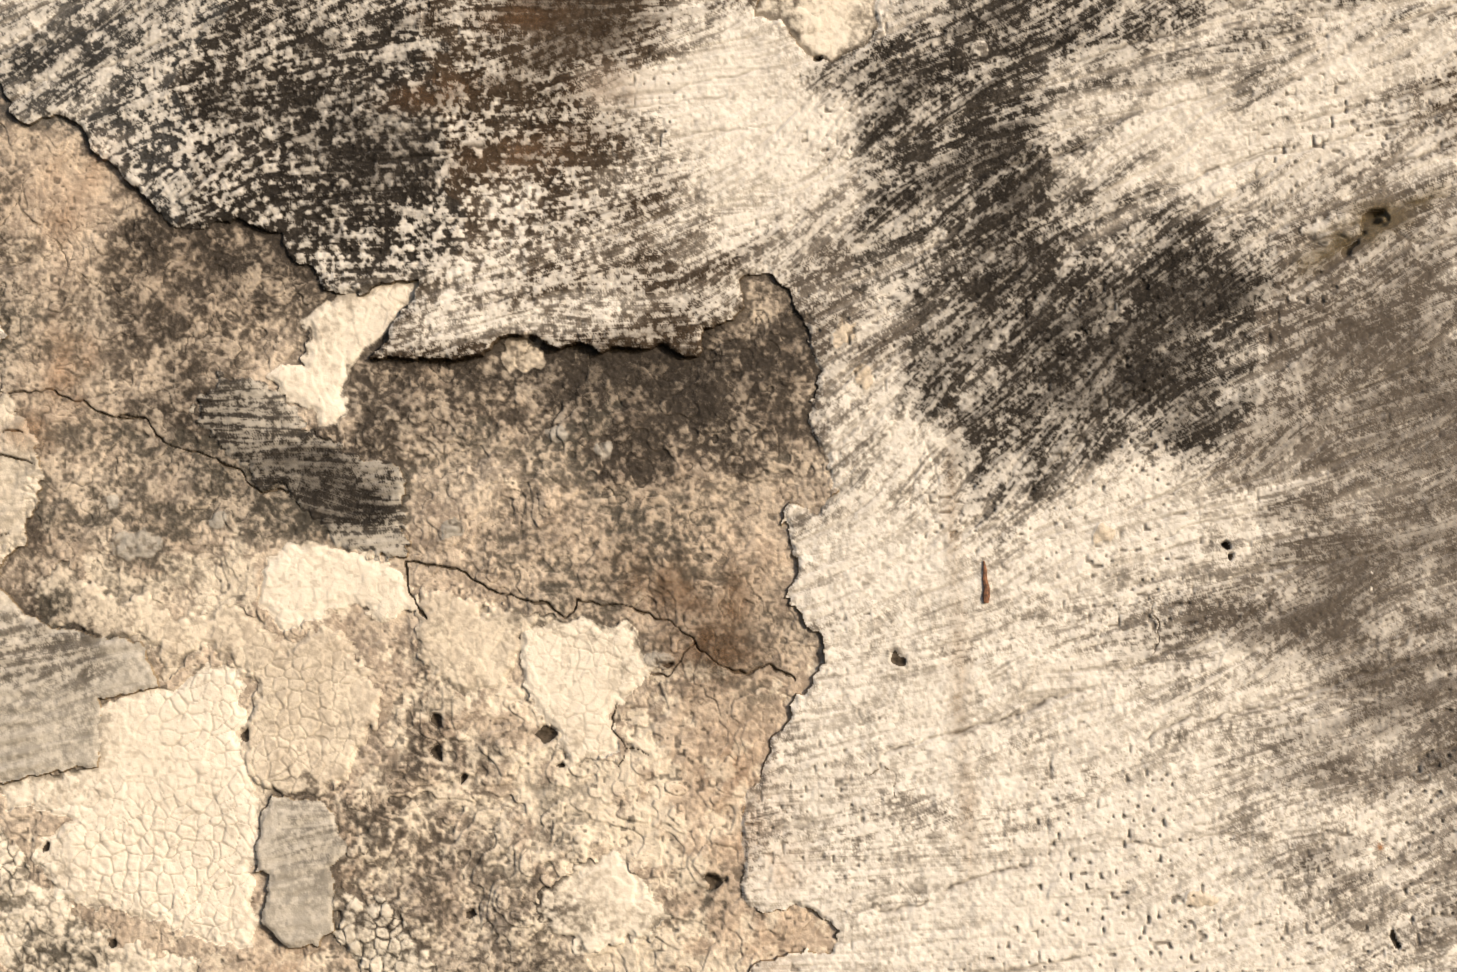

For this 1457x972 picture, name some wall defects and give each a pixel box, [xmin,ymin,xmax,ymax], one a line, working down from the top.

peeling [754,0,878,62]
spalling [833,318,856,349]
spalling [853,361,873,390]
crack [0,430,35,465]
crack [11,389,290,495]
spalling [0,86,840,972]
spalling [891,650,906,666]
crack [332,885,438,972]